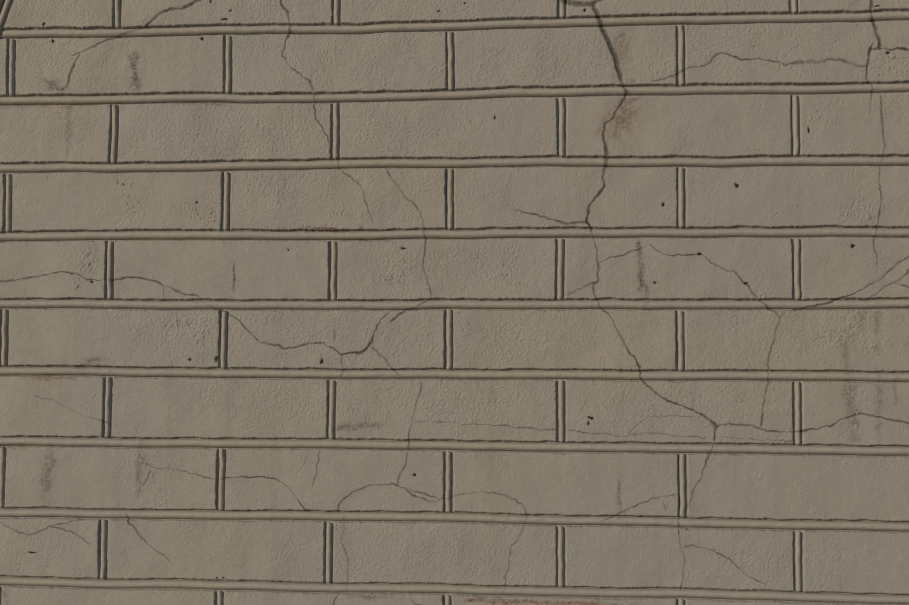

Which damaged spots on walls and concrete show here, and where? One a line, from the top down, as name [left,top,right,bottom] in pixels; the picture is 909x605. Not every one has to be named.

crack [595,10,627,104]
crack [866,1,908,76]
crack [573,183,605,229]
crack [340,313,401,370]